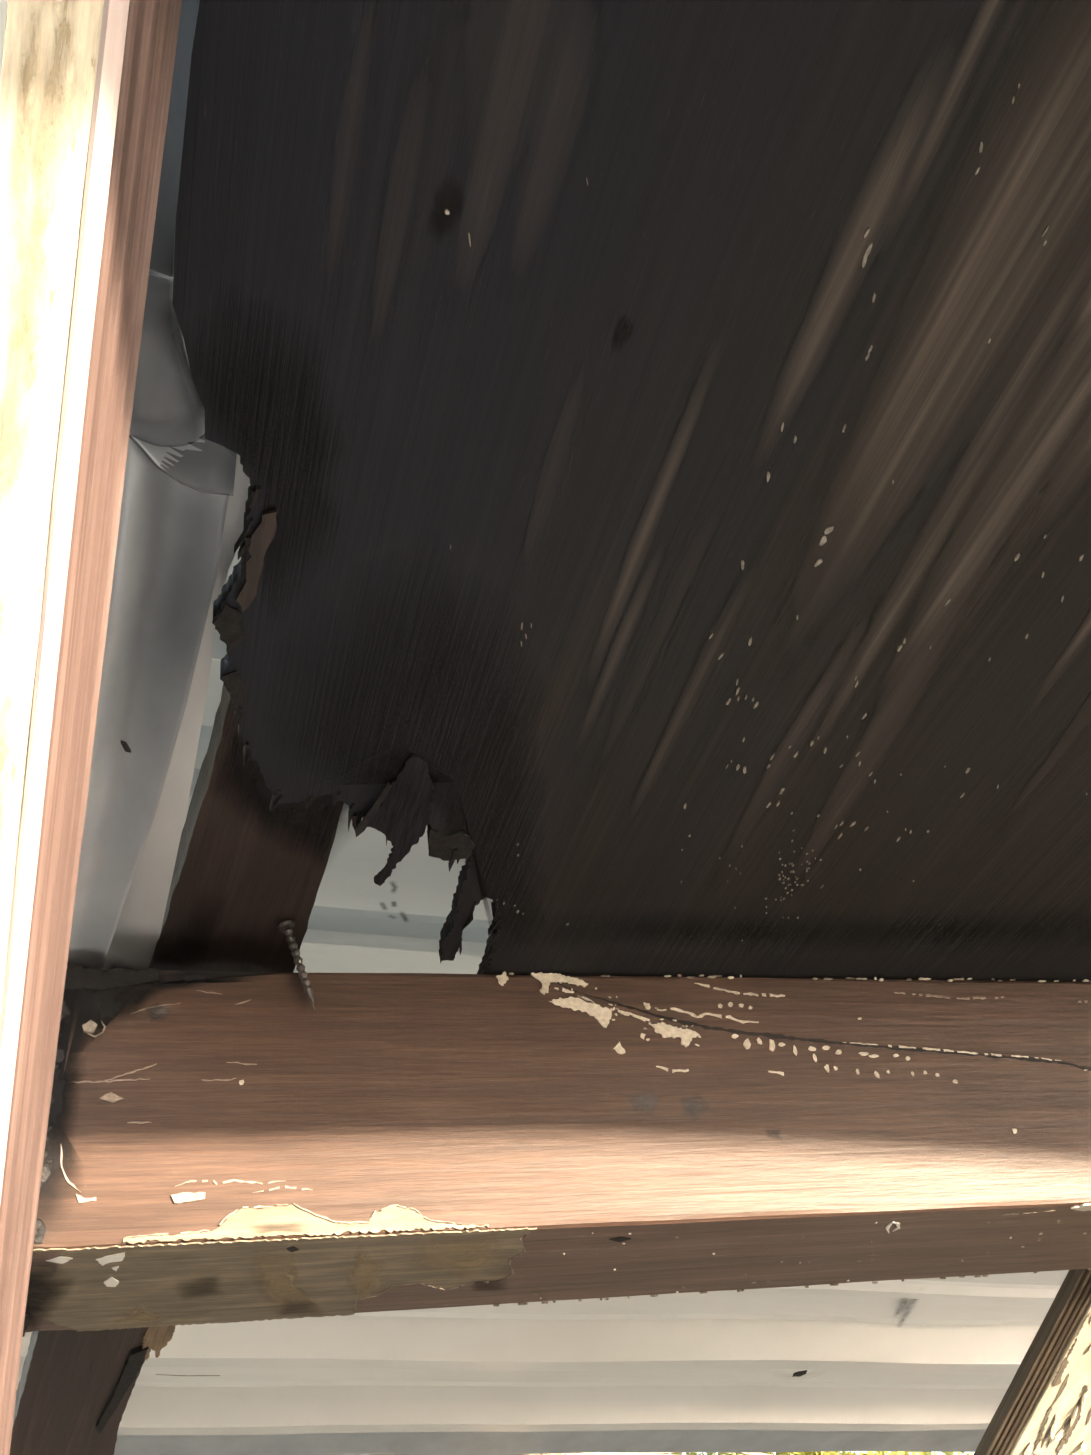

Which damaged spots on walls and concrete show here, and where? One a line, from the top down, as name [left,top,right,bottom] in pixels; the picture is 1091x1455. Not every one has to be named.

peeling [212,602,244,652]
peeling [221,670,246,711]
peeling [428,827,475,861]
peeling [812,977,1016,1000]
peeling [496,971,958,1083]
peeling [31,1179,537,1331]
peeling [1024,1313,1091,1455]